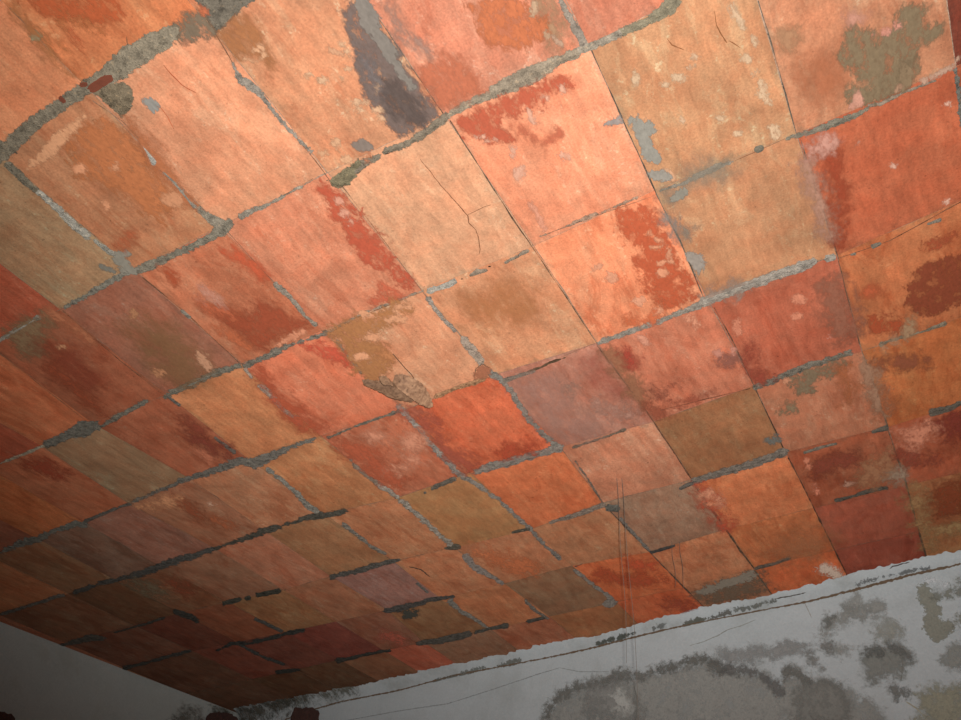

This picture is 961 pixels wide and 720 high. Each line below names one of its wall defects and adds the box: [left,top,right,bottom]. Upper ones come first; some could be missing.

water stain [339,0,574,180]
crack [420,159,489,253]
water stain [661,570,769,612]
water stain [541,593,961,720]